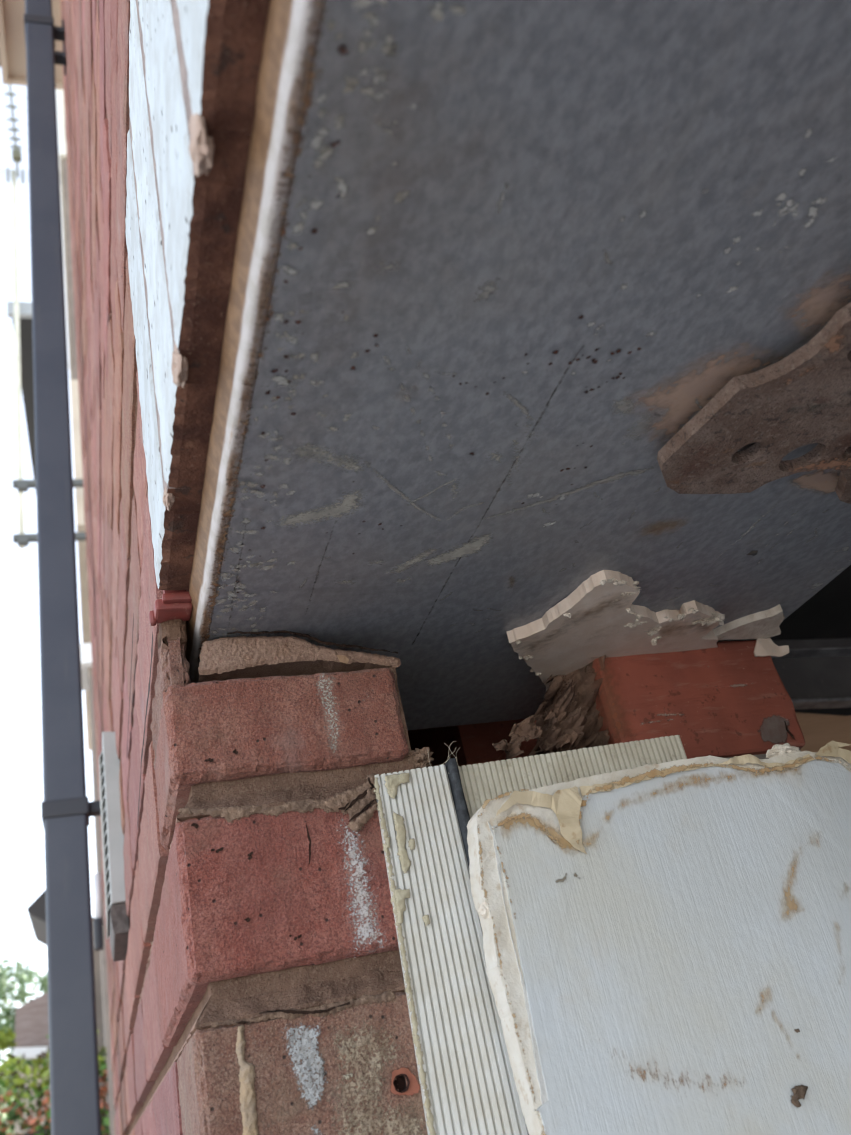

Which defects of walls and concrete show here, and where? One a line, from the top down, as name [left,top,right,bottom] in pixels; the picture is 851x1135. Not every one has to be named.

corrosion [792,274,851,353]
corrosion [639,352,783,436]
corrosion [787,457,851,493]
peeling [198,630,401,683]
spalling [322,773,378,832]
water stain [340,825,383,952]
crack [236,1002,350,1024]